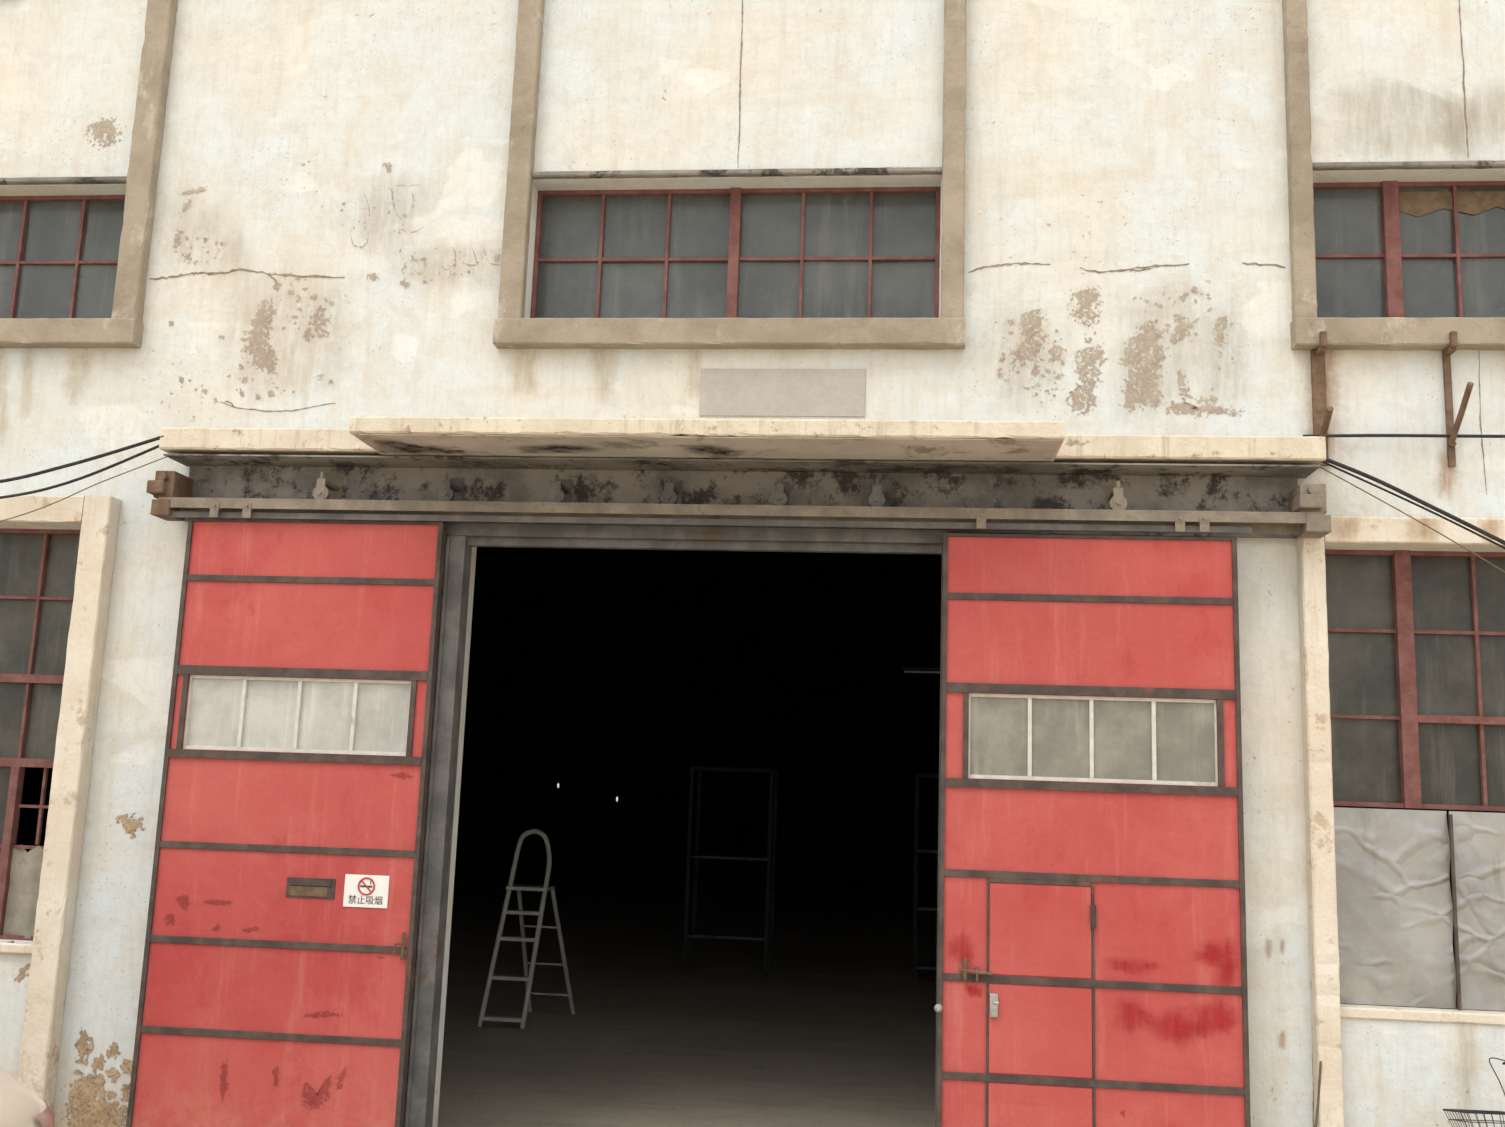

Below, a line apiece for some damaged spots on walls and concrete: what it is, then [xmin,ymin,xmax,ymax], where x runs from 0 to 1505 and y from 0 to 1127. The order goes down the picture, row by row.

crack [1459,0,1469,158]
peeling [86,114,126,152]
crack [149,268,345,284]
crack [968,262,1189,273]
crack [1242,261,1285,269]
peeling [219,272,334,400]
peeling [994,285,1245,419]
flaking render [116,813,146,839]
flaking render [61,1027,133,1127]